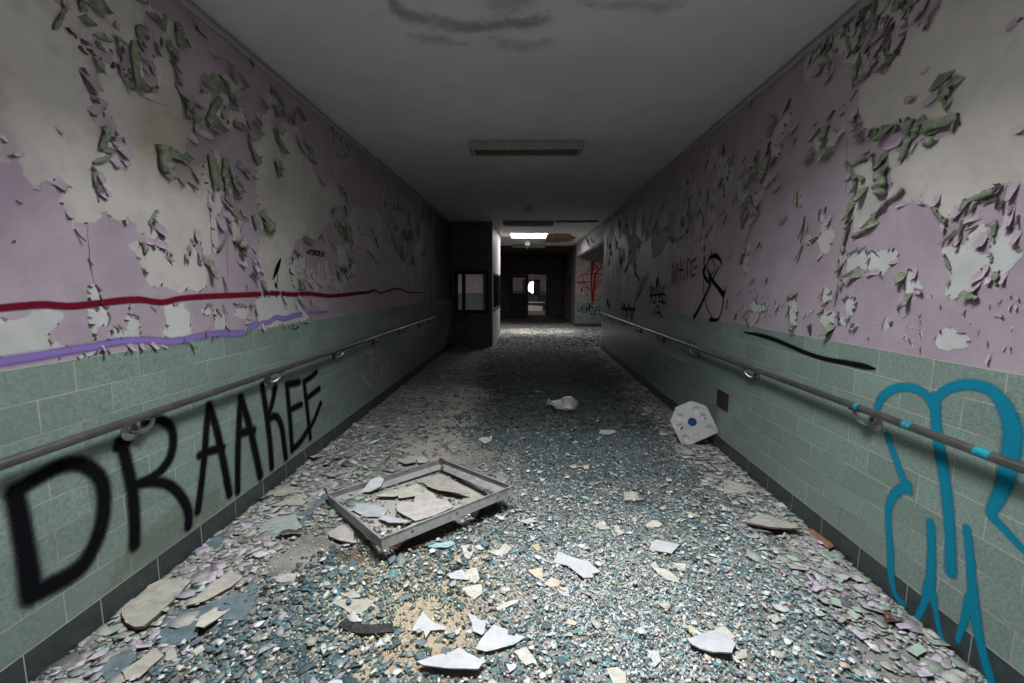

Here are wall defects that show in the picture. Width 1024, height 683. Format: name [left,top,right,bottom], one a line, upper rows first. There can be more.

peeling [0,0,356,362]
peeling [539,195,674,281]
peeling [727,0,1024,363]